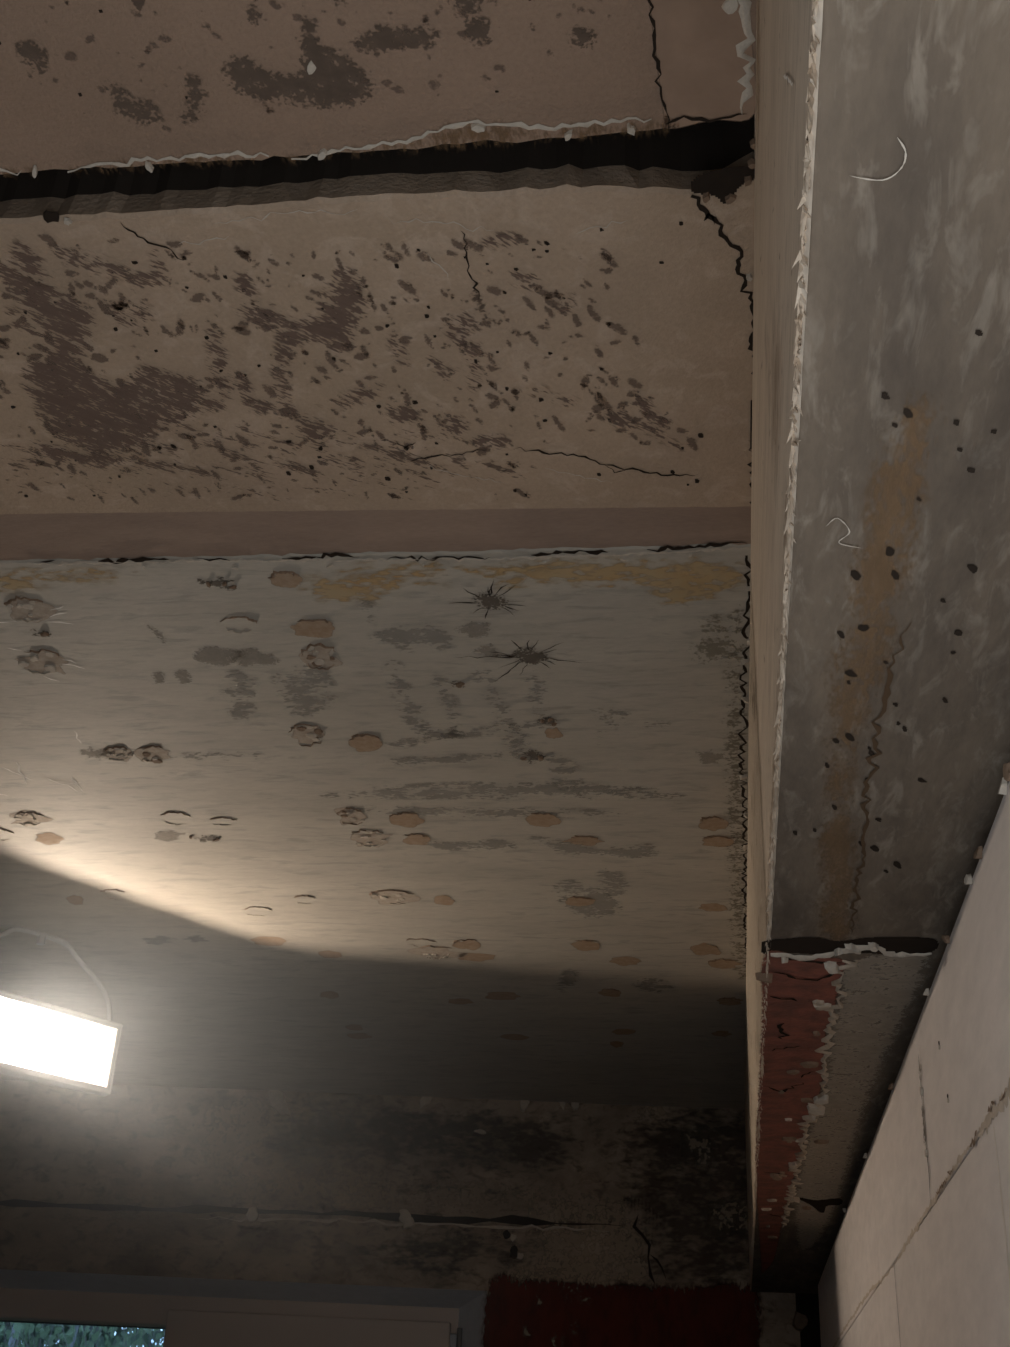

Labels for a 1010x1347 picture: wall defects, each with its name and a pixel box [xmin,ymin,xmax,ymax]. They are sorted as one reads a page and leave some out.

damp [15,40,58,83]
damp [99,75,207,131]
damp [222,0,497,112]
crack [647,0,743,132]
damp [0,233,697,504]
crack [691,195,753,504]
peeling [27,542,751,590]
spalling [81,745,170,764]
spalling [0,810,64,845]
spalling [690,942,879,1272]
crack [918,1057,1005,1200]
crack [0,1199,666,1284]